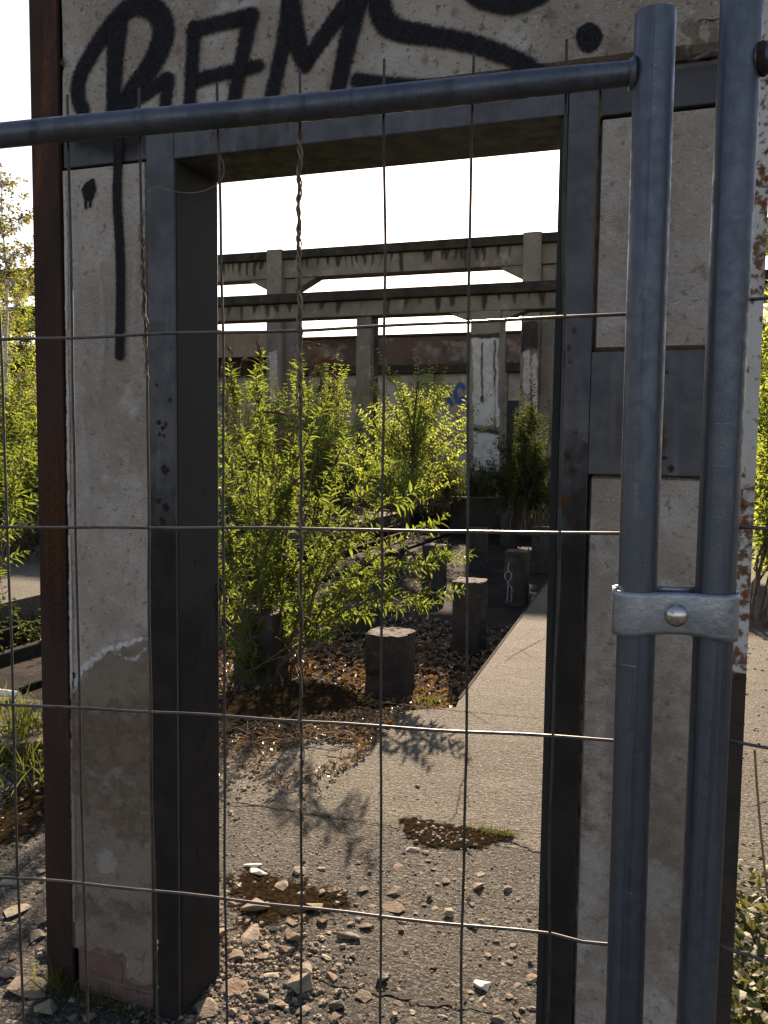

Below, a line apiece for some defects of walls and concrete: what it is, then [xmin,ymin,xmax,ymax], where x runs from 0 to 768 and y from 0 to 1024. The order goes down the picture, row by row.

damp [71,637,151,847]
spalling [79,945,154,1009]